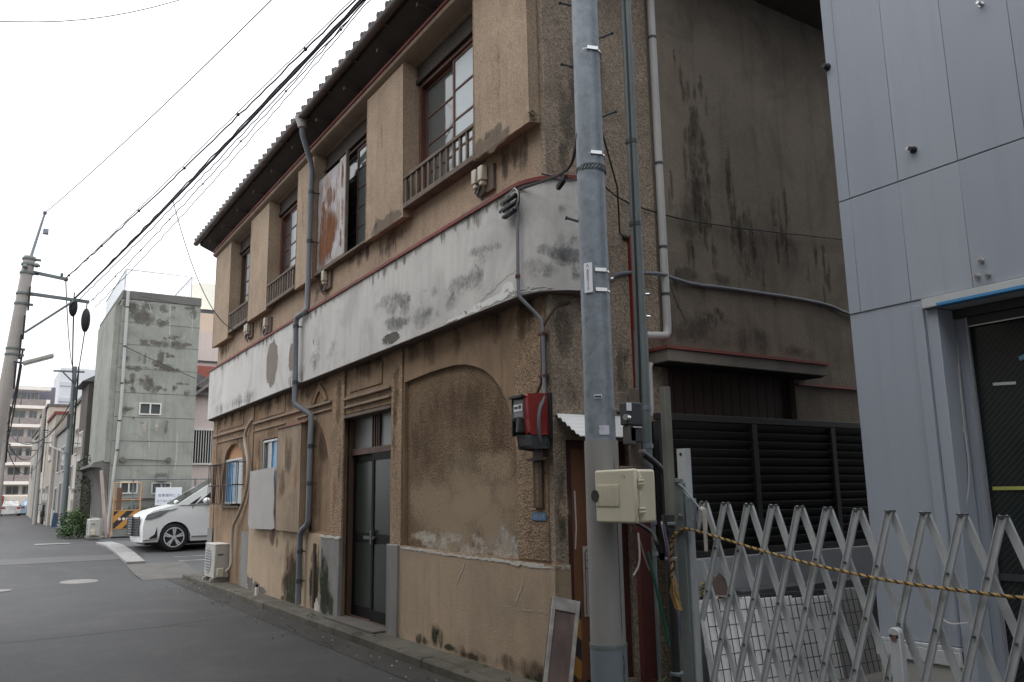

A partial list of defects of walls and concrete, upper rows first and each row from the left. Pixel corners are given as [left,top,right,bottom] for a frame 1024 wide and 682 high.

rust [319,164,344,267]
water stain [271,531,333,615]
water stain [503,656,543,682]